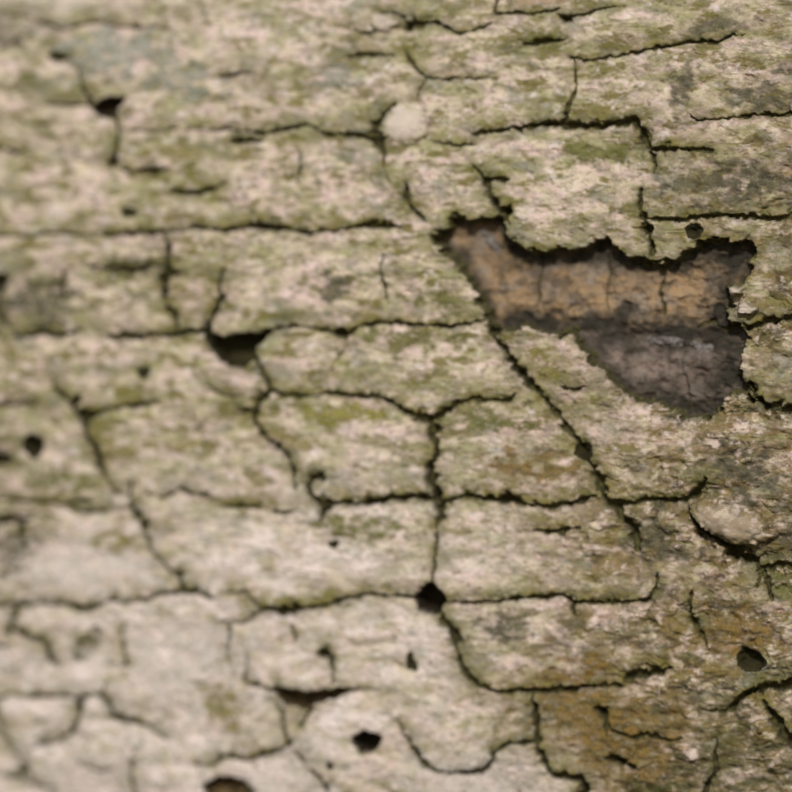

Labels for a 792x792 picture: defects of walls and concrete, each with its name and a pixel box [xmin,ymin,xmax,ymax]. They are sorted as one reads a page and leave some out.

crack [20,53,94,127]
crack [109,102,427,222]
crack [346,0,792,256]
crack [0,220,402,342]
spalling [431,211,761,421]
crack [746,314,792,331]
crack [204,319,792,601]
crack [0,377,415,792]
crack [688,591,708,648]
crack [389,573,683,792]
crack [702,740,719,792]
crack [703,678,792,749]